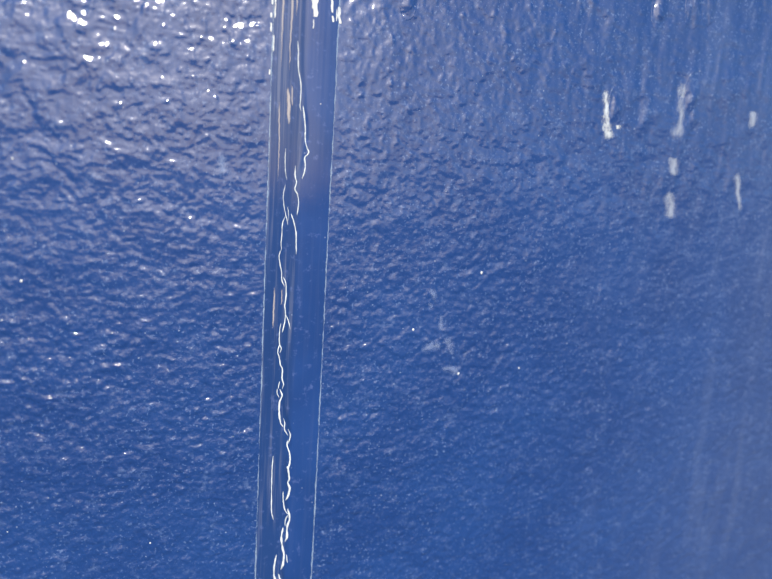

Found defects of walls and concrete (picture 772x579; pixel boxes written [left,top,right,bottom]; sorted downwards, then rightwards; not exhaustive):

crack [271,45,309,579]